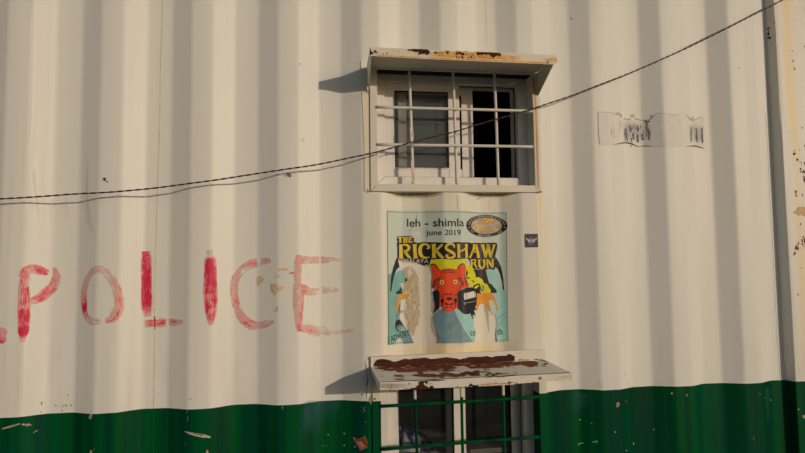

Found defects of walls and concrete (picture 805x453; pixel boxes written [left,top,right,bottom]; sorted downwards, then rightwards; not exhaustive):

peeling [257,268,289,295]
corrosion [384,336,518,356]
corrosion [361,49,558,191]
corrosion [531,75,552,349]
corrosion [764,0,805,381]